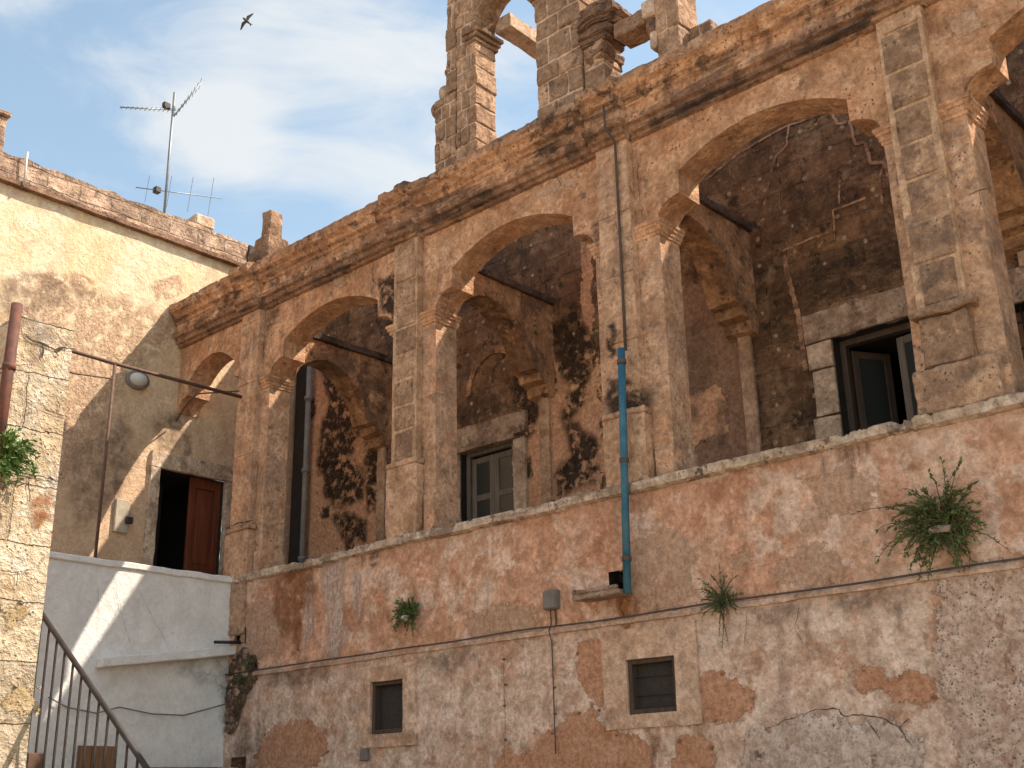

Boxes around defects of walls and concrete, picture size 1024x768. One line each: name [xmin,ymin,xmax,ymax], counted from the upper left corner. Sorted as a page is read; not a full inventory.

flaking render [230,716,329,768]
flaking render [493,638,653,768]
flaking render [671,669,756,768]
crack [765,707,913,748]
flaking render [853,557,1024,768]